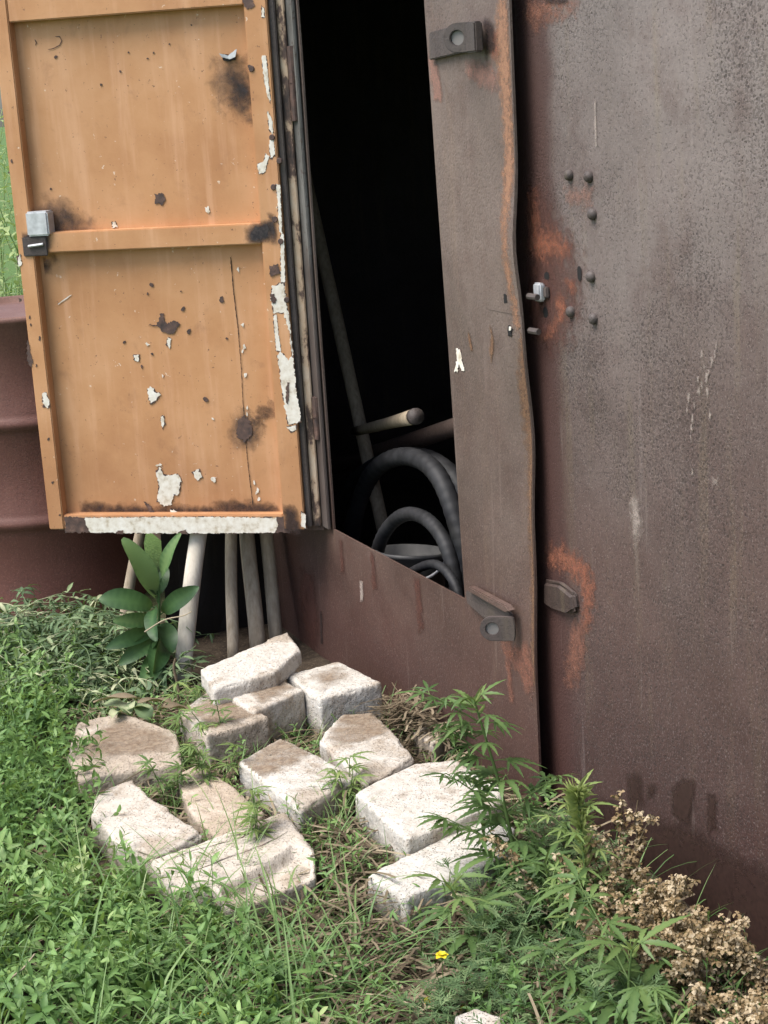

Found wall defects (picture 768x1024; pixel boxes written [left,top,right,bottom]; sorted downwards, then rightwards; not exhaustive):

peeling [242,0,266,18]
peeling [248,55,276,174]
peeling [269,184,302,433]
rust [527,194,577,354]
peeling [42,392,50,409]
peeling [59,464,307,535]
rust [81,501,300,533]
rust [549,546,595,684]